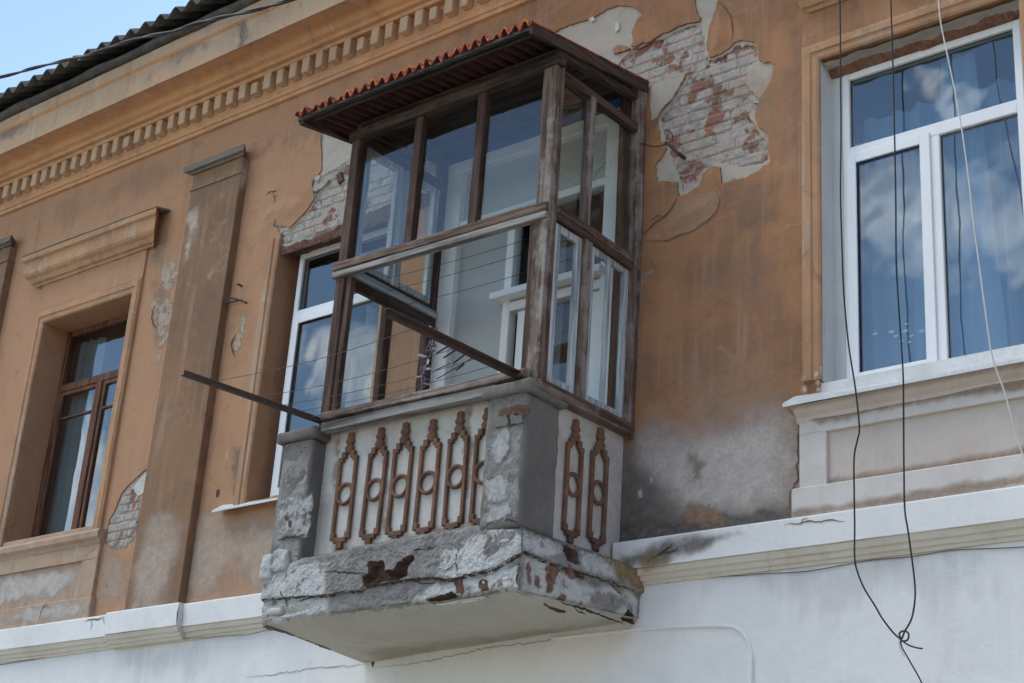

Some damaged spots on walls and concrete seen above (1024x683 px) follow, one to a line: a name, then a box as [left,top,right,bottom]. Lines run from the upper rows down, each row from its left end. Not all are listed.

peeling [557,0,774,197]
peeling [277,134,352,256]
peeling [364,159,394,230]
crack [645,195,720,242]
peeling [105,470,147,550]
peeling [277,495,313,538]
peeling [482,404,530,556]
water stain [619,416,799,565]
crack [785,408,845,525]
spalling [362,555,414,586]
spalling [426,579,492,606]
peeling [526,545,585,613]